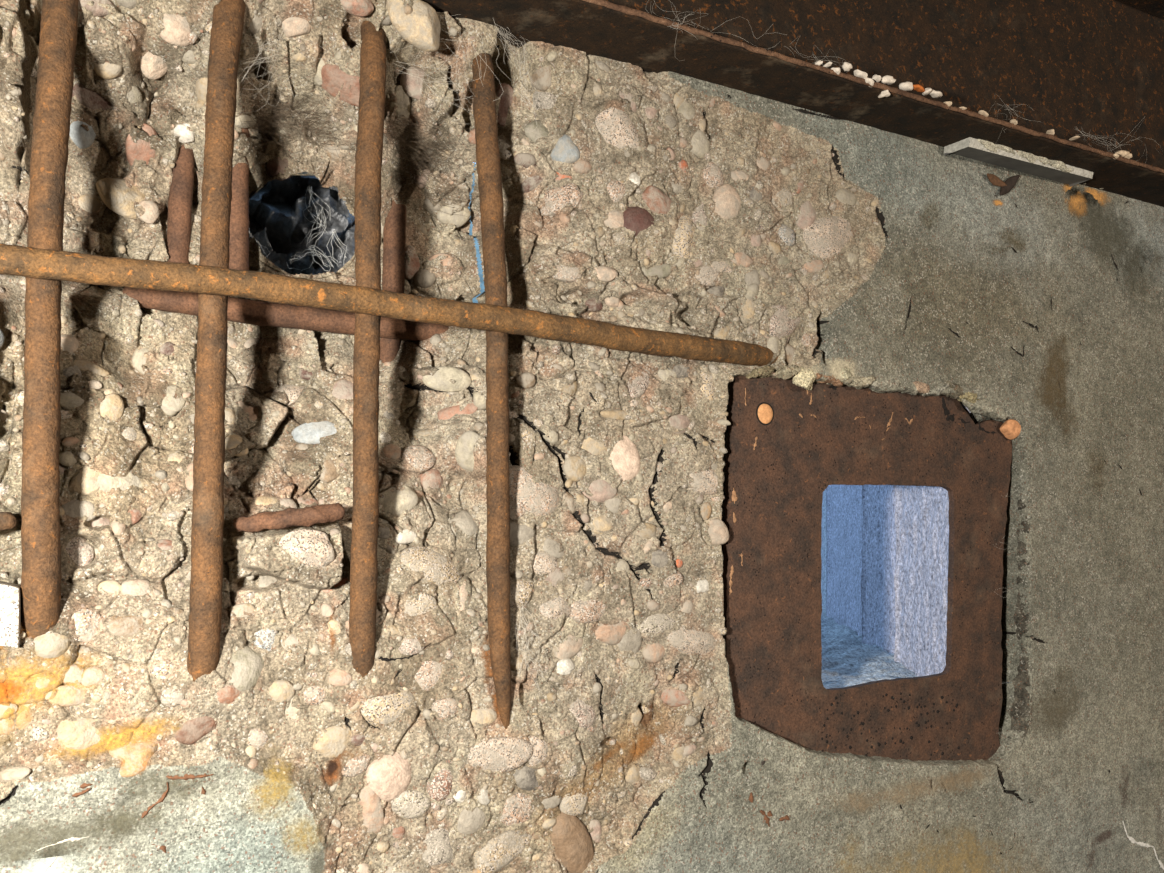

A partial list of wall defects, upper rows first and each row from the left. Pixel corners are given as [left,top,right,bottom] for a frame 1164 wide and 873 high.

spalling [906,381,1017,420]
spalling [0,0,900,873]
crack [509,392,715,600]
corrosion [0,658,84,718]
corrosion [483,636,500,717]
crack [595,674,605,724]
corrosion [71,725,160,755]
crack [1123,822,1164,870]